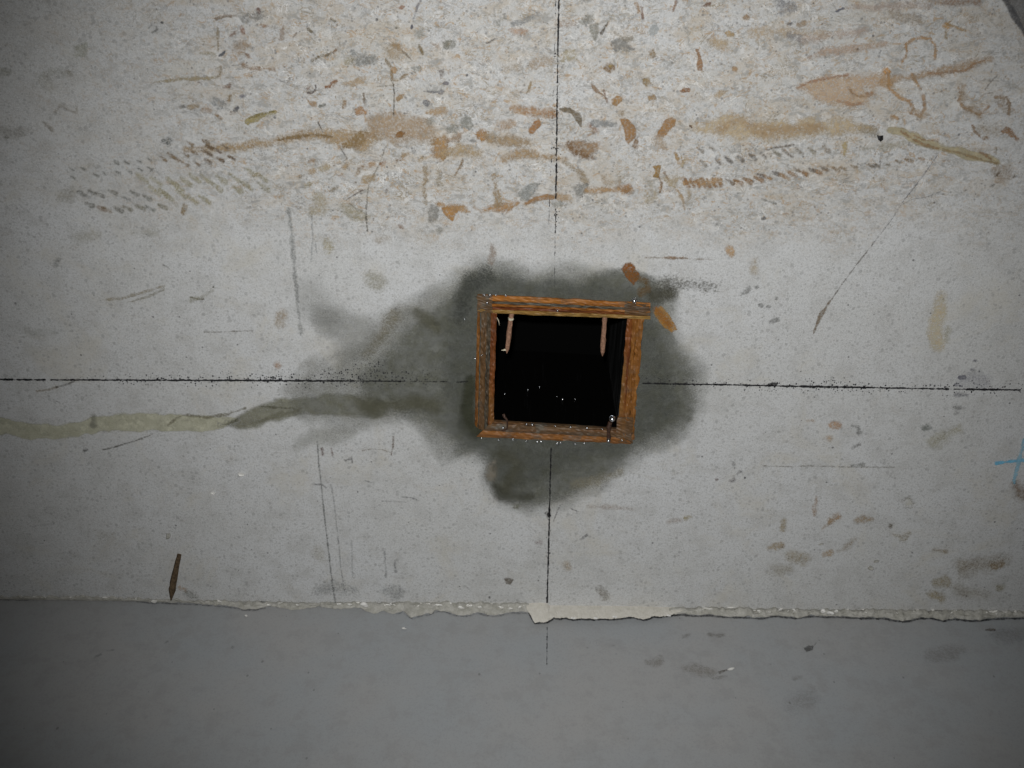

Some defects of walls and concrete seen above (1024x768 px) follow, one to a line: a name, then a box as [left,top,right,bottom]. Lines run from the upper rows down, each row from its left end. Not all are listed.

rust [622,263,648,294]
rust [655,306,677,332]
damp [0,271,712,502]
peeling [498,603,683,624]